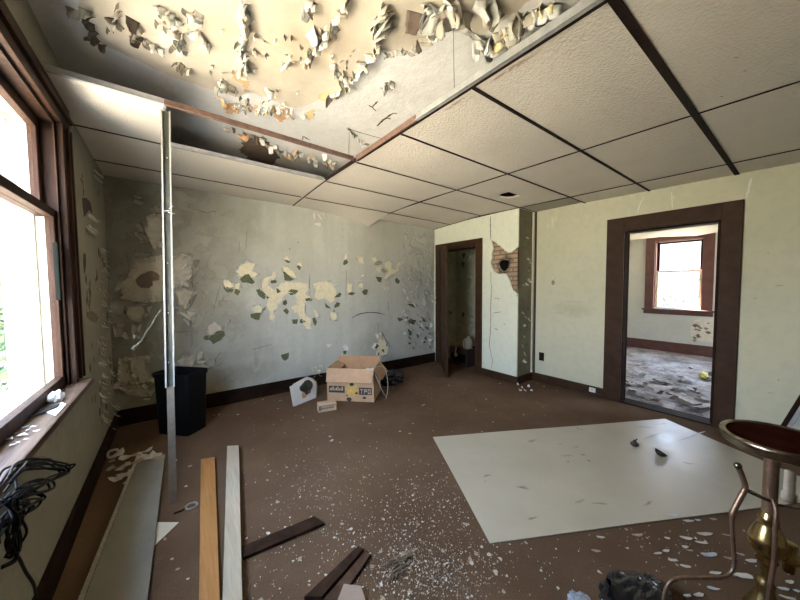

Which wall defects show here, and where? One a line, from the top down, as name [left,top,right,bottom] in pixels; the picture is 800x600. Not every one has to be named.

peeling [65,0,563,122]
peeling [224,127,337,170]
peeling [82,169,104,238]
peeling [83,204,199,430]
peeling [175,350,212,370]
peeling [222,242,401,329]
peeling [397,304,435,351]
flaking render [490,240,532,296]